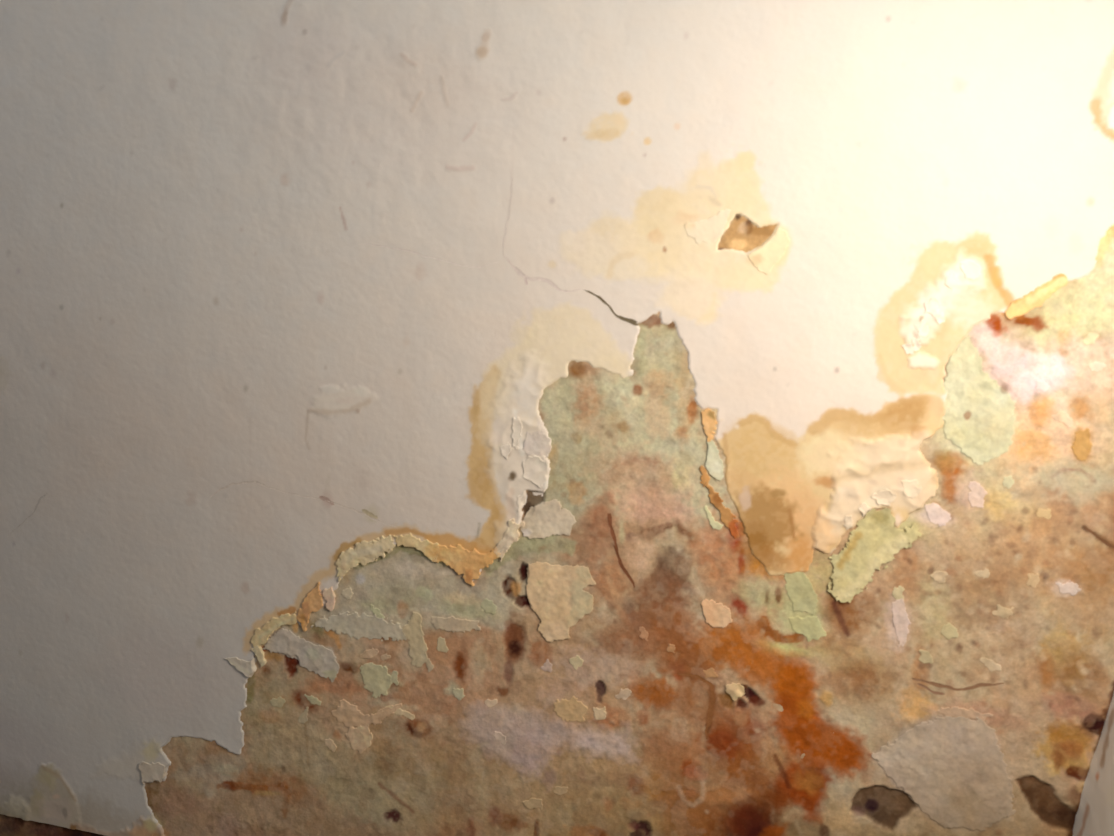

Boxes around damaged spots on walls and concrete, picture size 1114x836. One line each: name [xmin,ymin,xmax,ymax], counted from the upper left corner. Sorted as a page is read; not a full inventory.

crack [503,175,639,326]
damp [546,141,795,329]
spalling [718,214,778,253]
damp [241,298,634,657]
peeling [67,225,1114,836]
damp [714,229,1080,576]
rust [716,640,876,836]